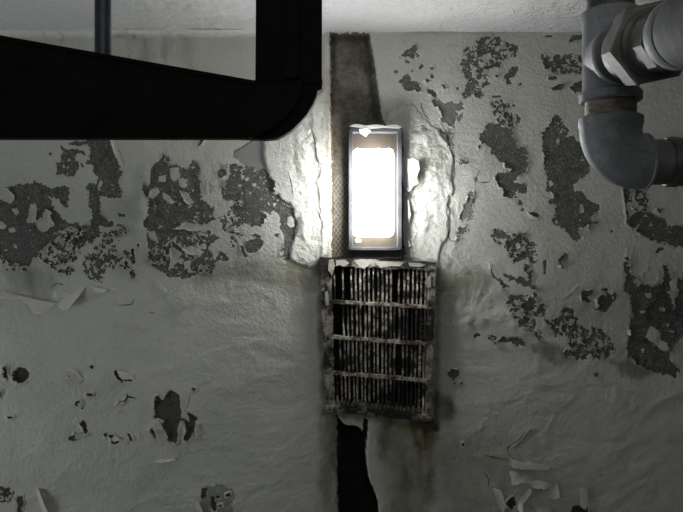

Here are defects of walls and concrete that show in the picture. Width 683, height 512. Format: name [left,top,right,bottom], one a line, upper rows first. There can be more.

peeling [0,140,297,315]
crack [421,103,455,187]
crack [446,209,464,242]
peeling [454,191,476,242]
peeling [394,33,539,220]
peeling [538,115,601,242]
peeling [619,187,683,253]
peeling [473,228,617,361]
peeling [579,254,683,378]
spalling [147,385,199,446]
spalling [336,416,379,512]
peeling [493,428,560,512]